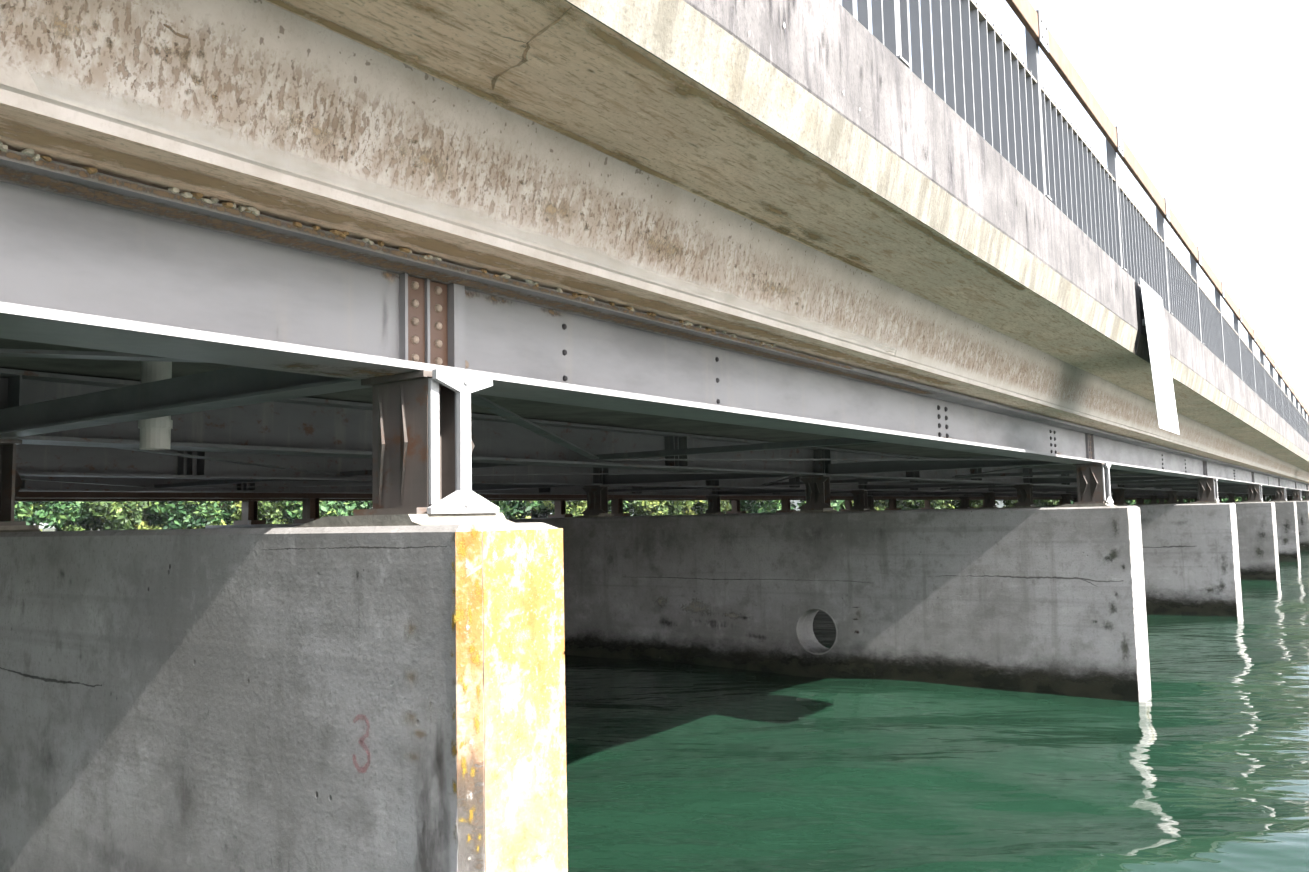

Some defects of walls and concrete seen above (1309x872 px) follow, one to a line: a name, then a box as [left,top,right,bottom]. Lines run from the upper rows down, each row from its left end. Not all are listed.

crack [492,7,572,90]
crack [944,575,1123,586]
crack [0,667,101,687]
corrosion [483,528,568,872]